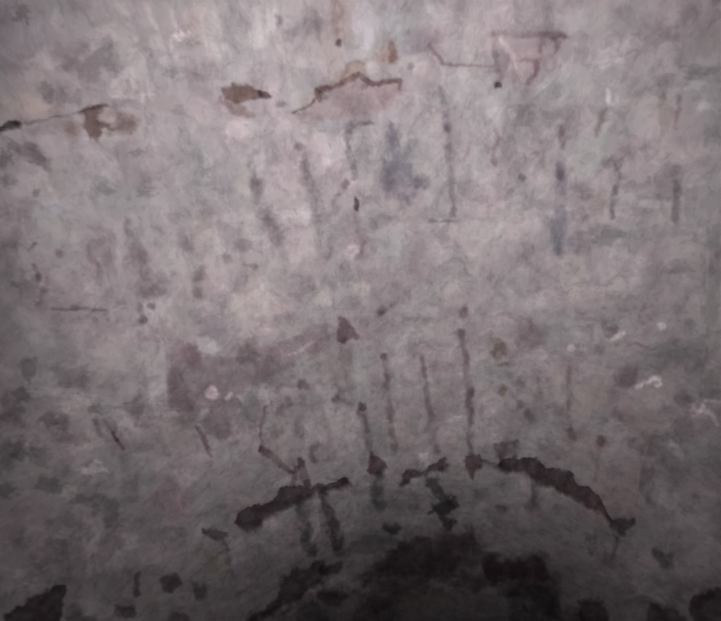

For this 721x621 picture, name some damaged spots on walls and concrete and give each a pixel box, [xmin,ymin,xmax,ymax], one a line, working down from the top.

crack [0,110,82,135]
peeling [290,56,432,132]
damp [156,302,612,621]
damp [0,582,101,621]